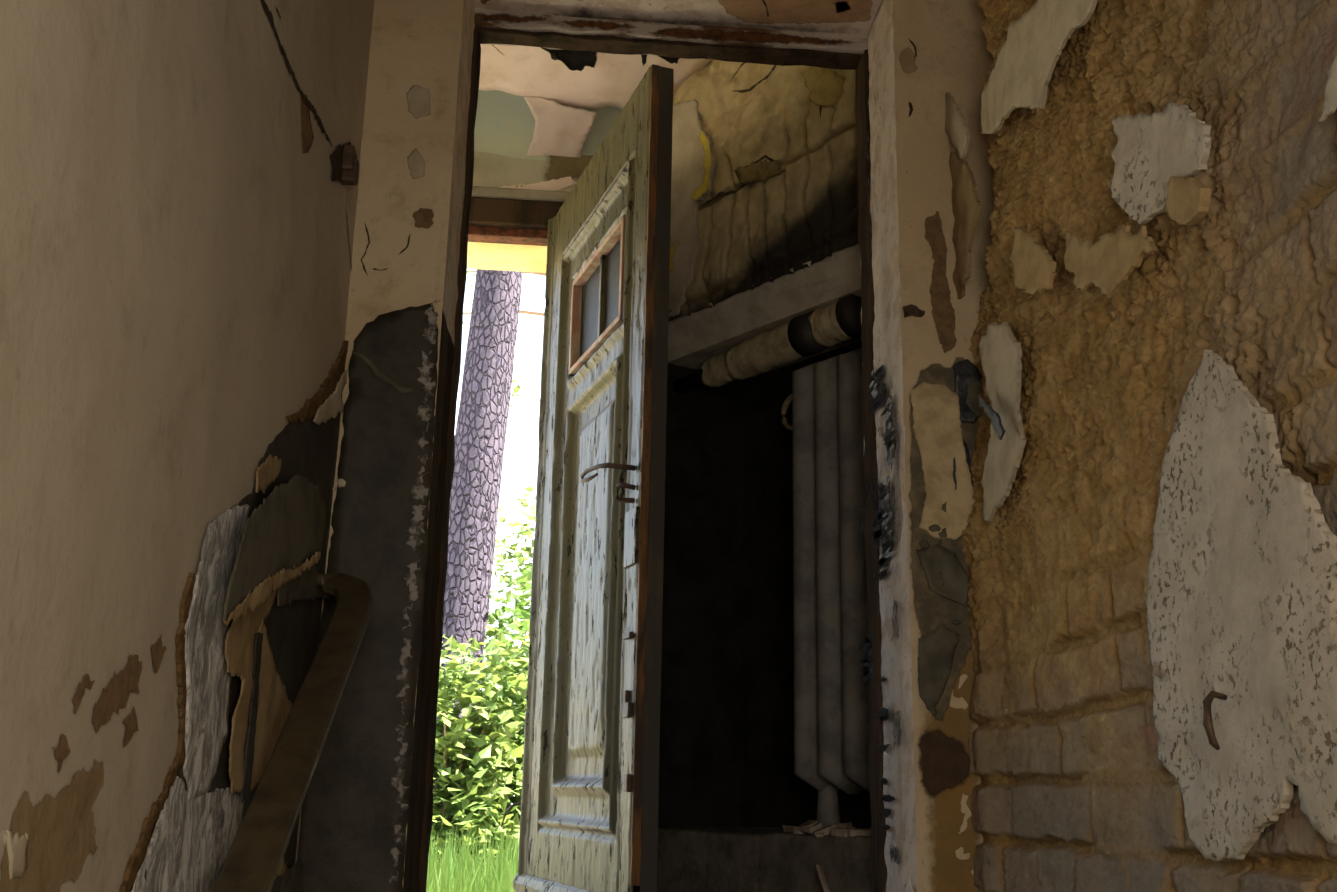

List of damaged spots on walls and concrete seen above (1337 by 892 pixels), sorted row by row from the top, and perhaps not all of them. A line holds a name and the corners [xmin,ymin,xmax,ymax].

crack [261,0,333,154]
peeling [479,44,711,157]
crack [729,62,777,93]
peeling [719,0,872,24]
spalling [1318,54,1337,146]
peeling [498,177,577,191]
crack [702,155,774,206]
peeling [1011,103,1211,298]
peeling [859,0,1098,864]
peeling [73,299,440,892]
peeling [1139,350,1337,861]
peeling [0,734,104,892]